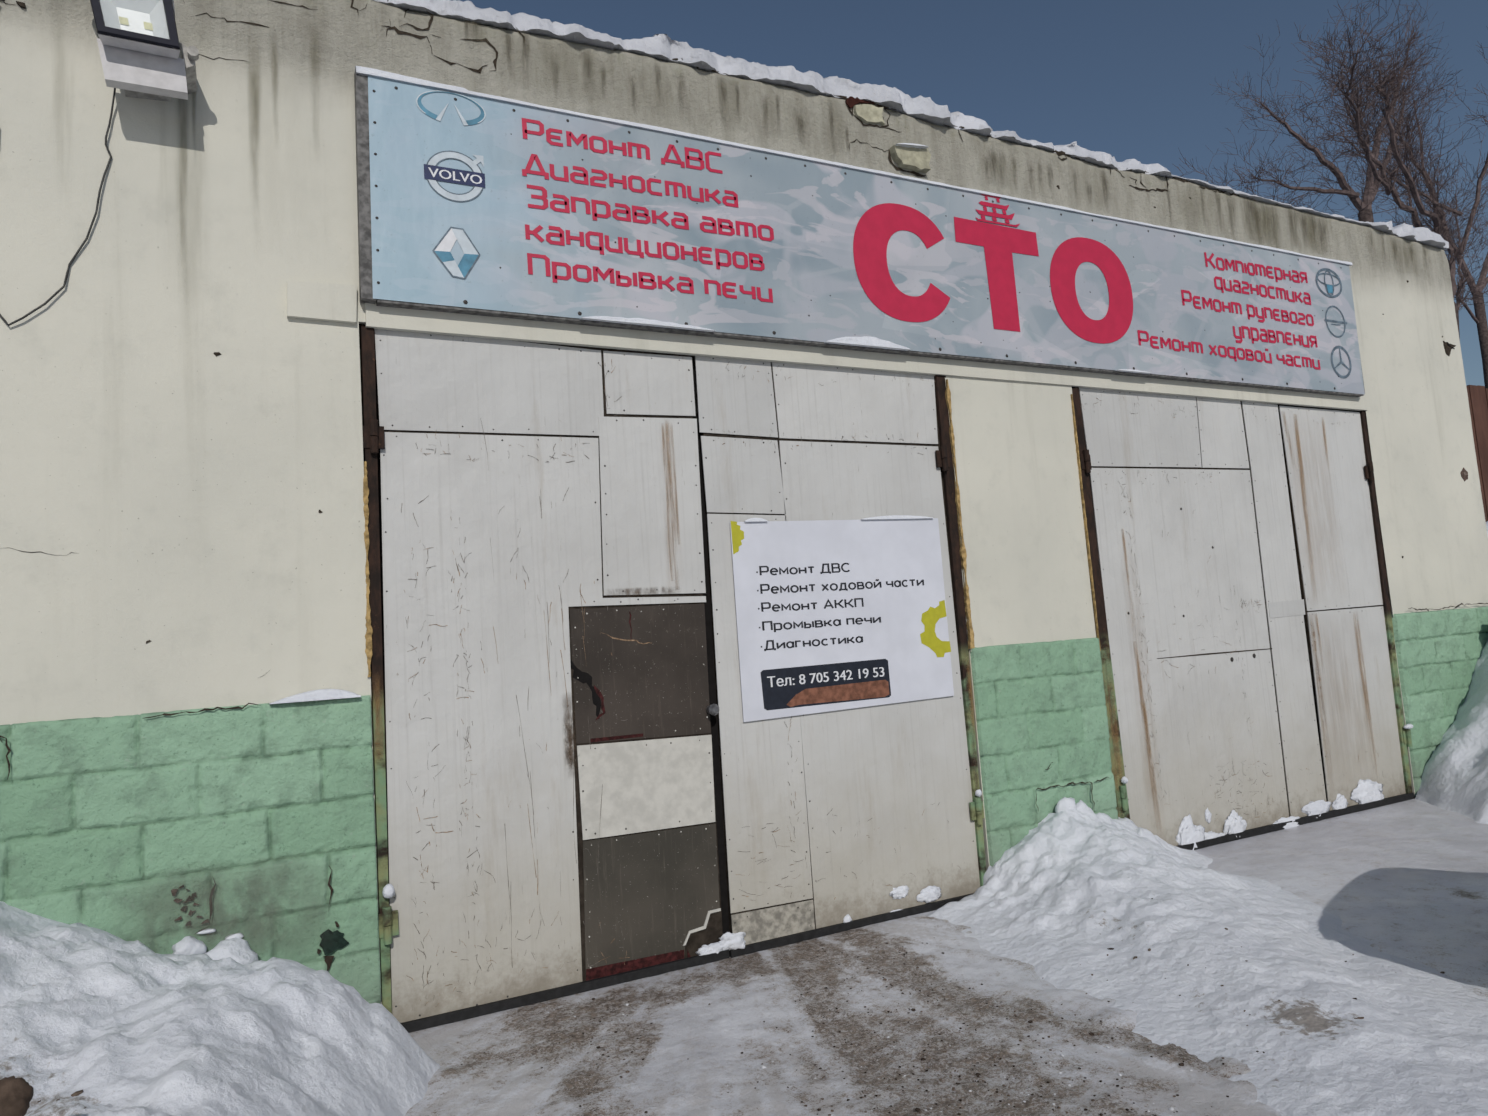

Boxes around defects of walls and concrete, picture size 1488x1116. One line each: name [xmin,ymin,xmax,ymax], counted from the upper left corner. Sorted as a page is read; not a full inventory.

crack [183,0,525,74]
crack [0,735,11,780]
crack [195,878,216,934]
crack [326,866,334,904]
peeling [317,949,334,971]